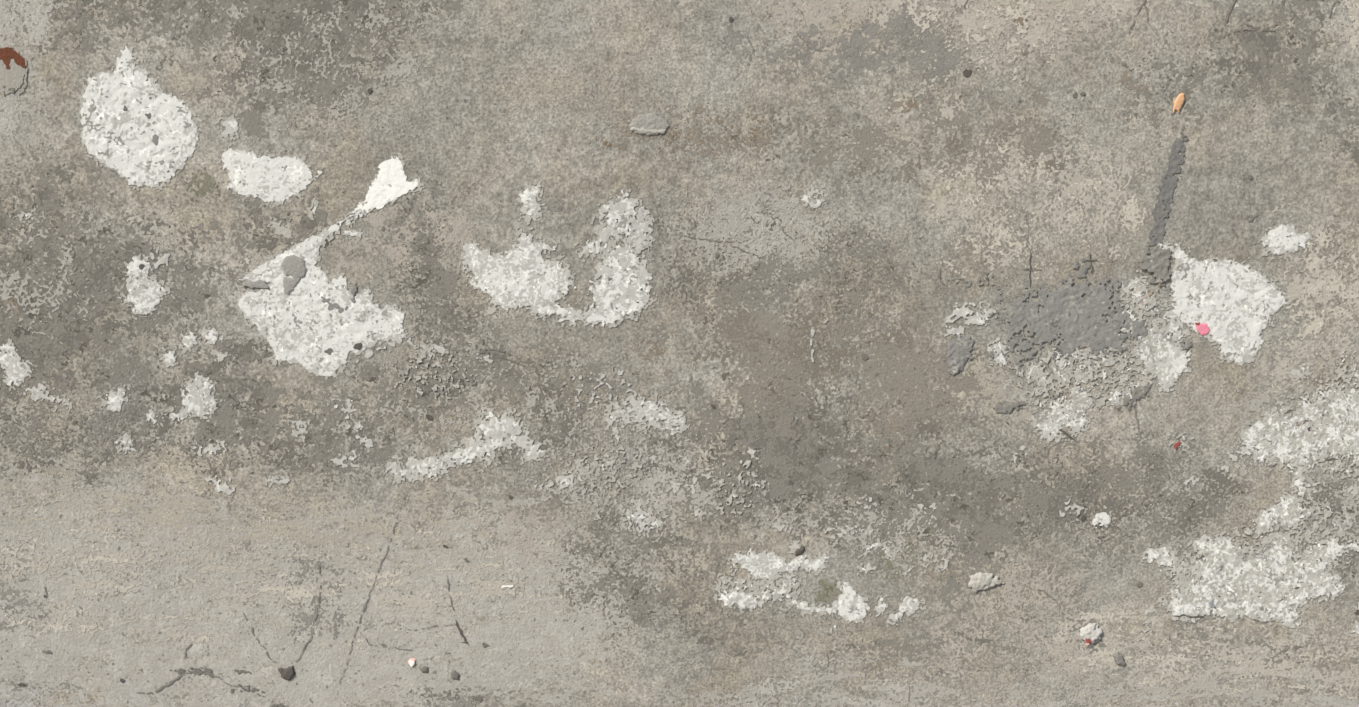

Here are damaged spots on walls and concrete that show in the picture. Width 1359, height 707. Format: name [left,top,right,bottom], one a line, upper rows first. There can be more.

corrosion [0,45,27,69]
leakage [131,168,220,213]
leakage [1223,208,1359,425]
crack [243,562,321,662]
crack [337,502,468,695]
crack [138,644,246,694]